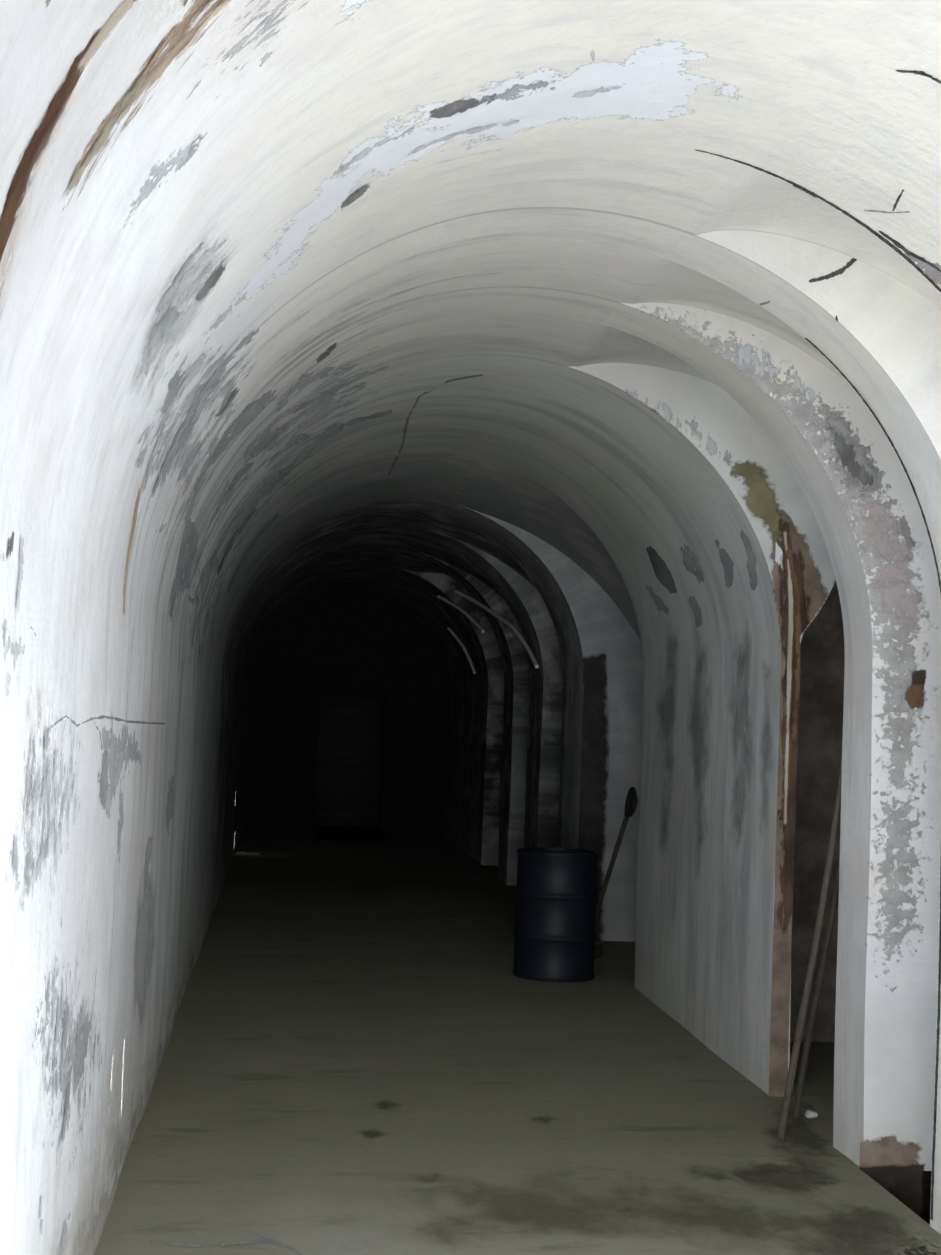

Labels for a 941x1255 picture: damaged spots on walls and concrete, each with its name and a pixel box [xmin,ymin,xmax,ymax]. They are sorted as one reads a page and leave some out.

corrosion [0,0,135,262]
corrosion [63,0,231,210]
crack [695,149,941,292]
crack [896,70,941,84]
peeling [125,39,742,661]
crack [805,338,941,594]
peeling [645,307,938,977]
corrosion [904,670,926,709]
peeling [32,939,102,1169]
crack [930,866,941,1221]
water stain [807,1211,911,1255]
water stain [859,1136,924,1218]